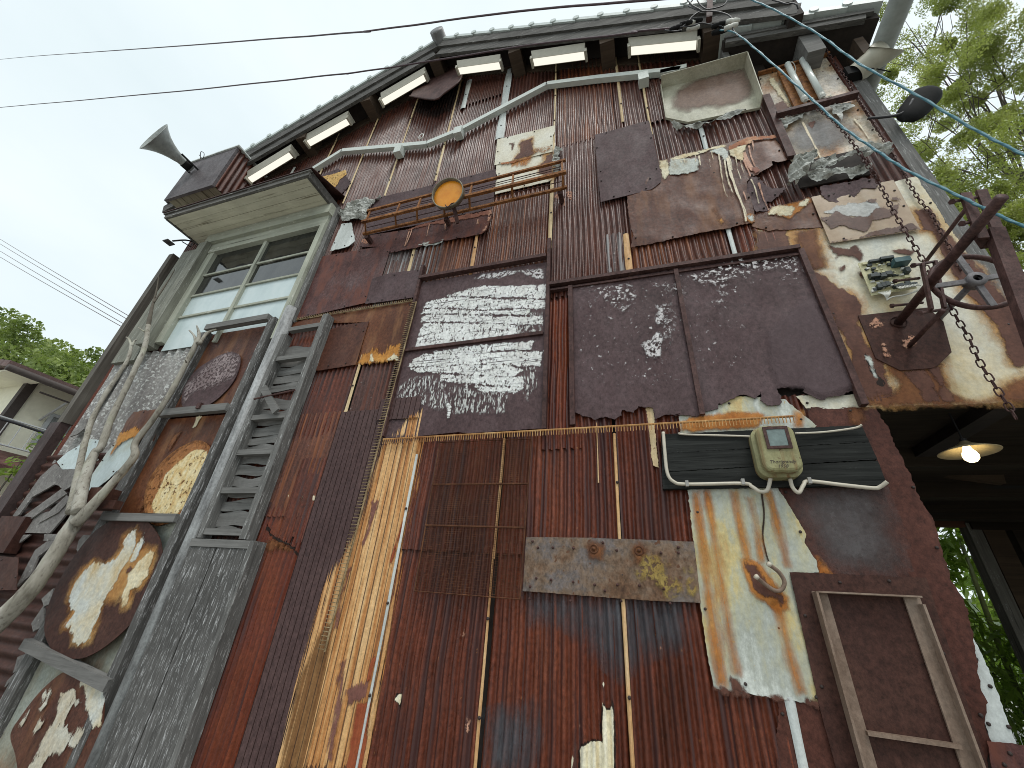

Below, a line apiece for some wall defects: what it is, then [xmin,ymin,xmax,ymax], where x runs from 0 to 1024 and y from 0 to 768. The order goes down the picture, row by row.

corrosion [501,137,553,179]
peeling [583,284,681,377]
peeling [691,258,797,309]
corrosion [756,209,1024,425]
corrosion [681,411,764,432]
peeling [145,441,208,524]
peeling [276,269,546,768]
peeling [63,529,155,646]
corrosion [633,490,750,698]
corrosion [733,491,819,709]
peeling [18,681,105,768]